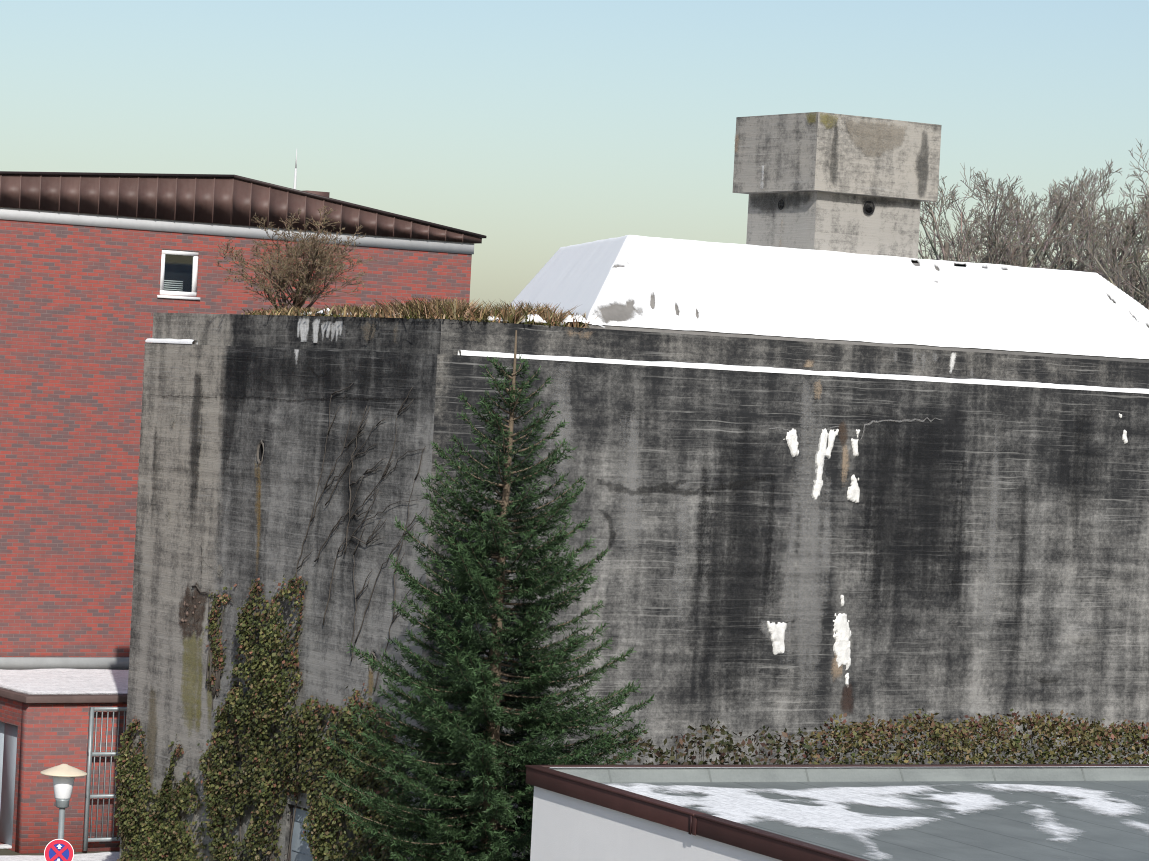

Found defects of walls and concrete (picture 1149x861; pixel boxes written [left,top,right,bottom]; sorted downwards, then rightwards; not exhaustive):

water stain [295,319,345,359]
water stain [191,375,202,508]
water stain [223,353,248,468]
water stain [554,369,571,471]
water stain [625,420,641,537]
water stain [697,437,775,679]
water stain [783,388,839,664]
water stain [861,411,965,607]
water stain [841,685,854,712]